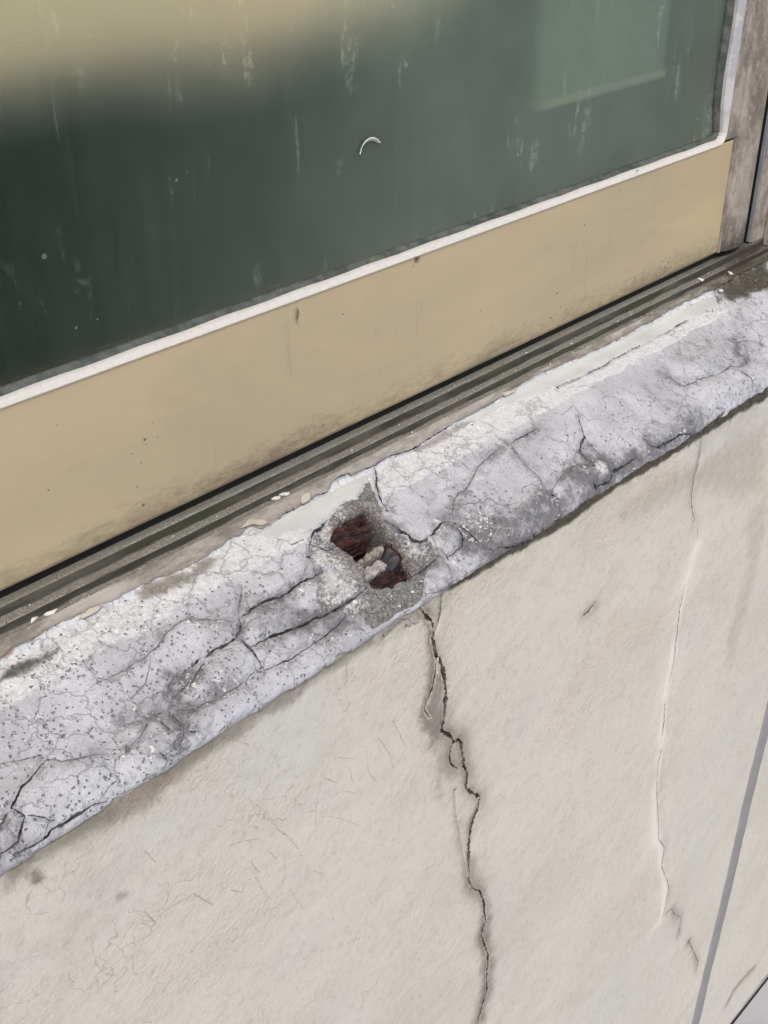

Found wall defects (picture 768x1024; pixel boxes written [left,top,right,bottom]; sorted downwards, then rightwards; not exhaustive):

crack [661,339,762,388]
spalling [241,473,434,629]
crack [0,296,720,1024]